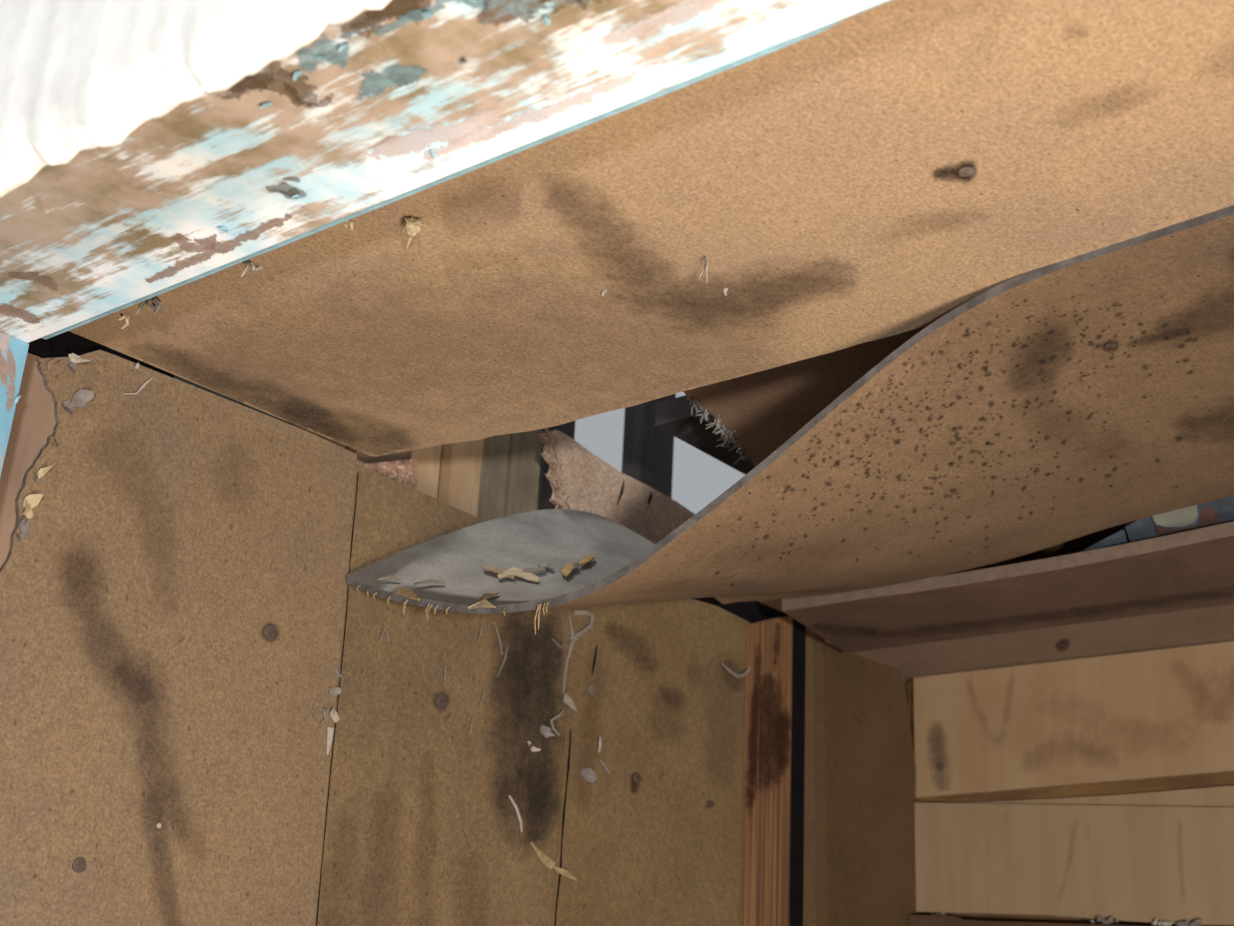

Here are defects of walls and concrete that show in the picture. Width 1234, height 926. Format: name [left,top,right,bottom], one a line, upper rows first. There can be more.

peeling [219,0,596,110]
peeling [600,0,731,46]
peeling [364,73,641,161]
peeling [266,178,306,199]
peeling [0,303,44,327]
peeling [8,272,58,291]
peeling [145,214,292,283]
peeling [561,554,595,577]
damp [746,627,780,806]
crack [554,729,571,926]